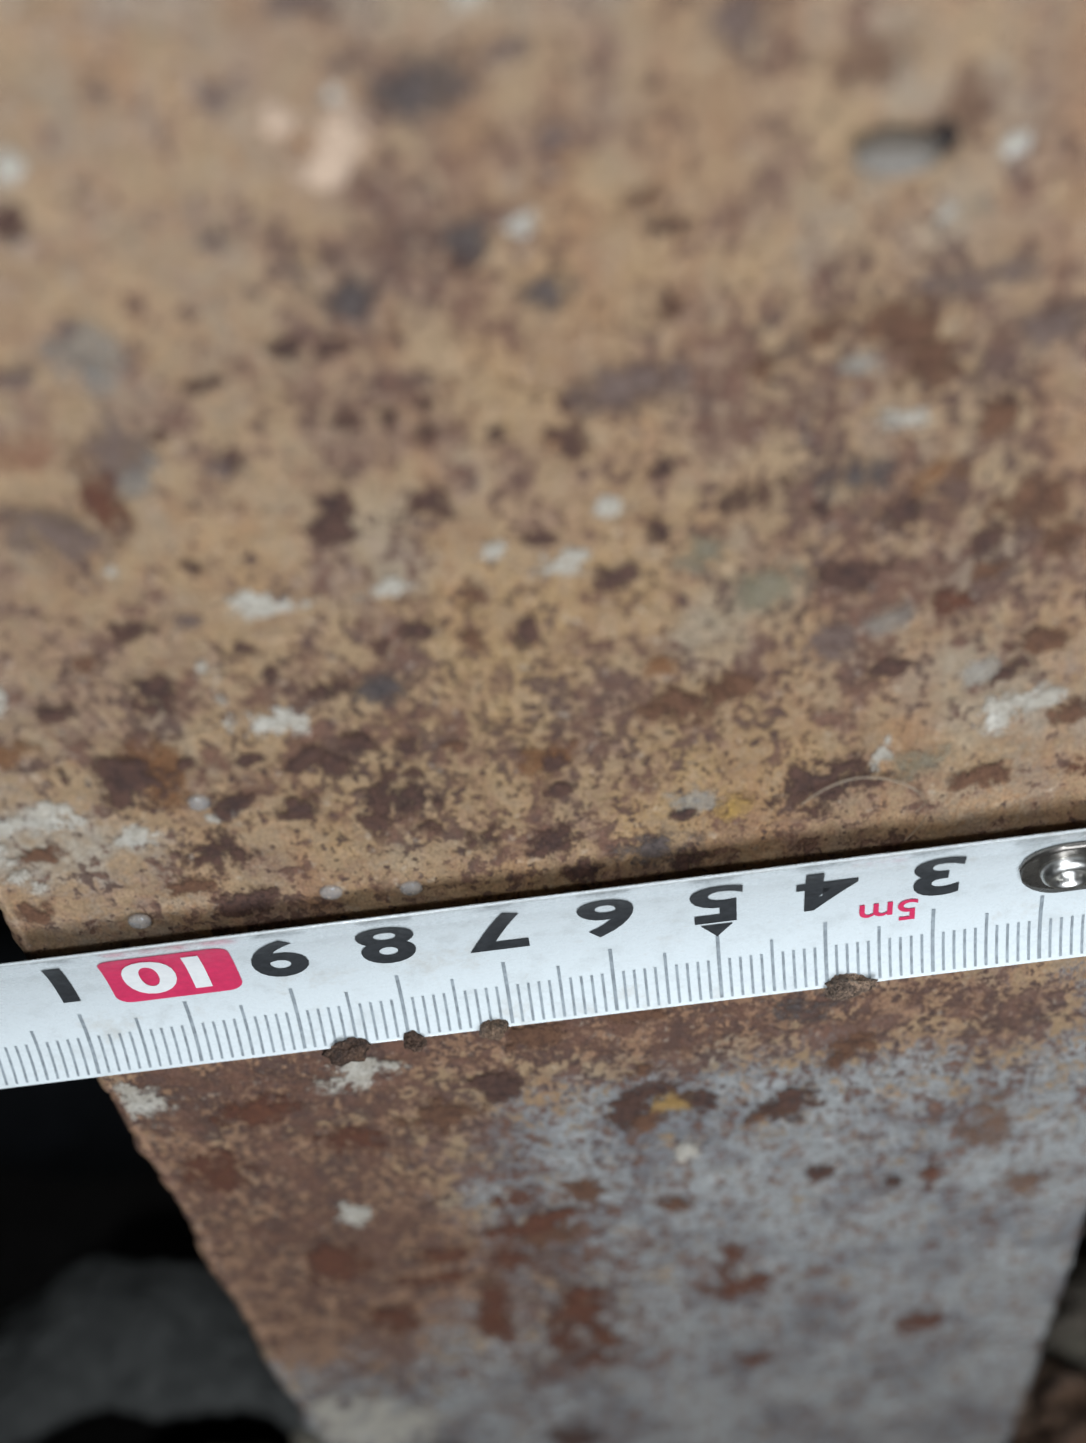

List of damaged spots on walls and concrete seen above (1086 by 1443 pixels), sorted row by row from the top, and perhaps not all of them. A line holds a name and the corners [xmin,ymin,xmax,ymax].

corrosion [304,490,360,549]
corrosion [988,624,1083,688]
corrosion [91,740,198,812]
corrosion [166,793,281,918]
corrosion [230,734,447,840]
corrosion [527,751,885,887]
corrosion [949,759,1023,792]
corrosion [604,1006,688,1025]
corrosion [313,1023,569,1156]
corrosion [600,1063,719,1135]
corrosion [741,1032,877,1126]
corrosion [408,1178,621,1344]